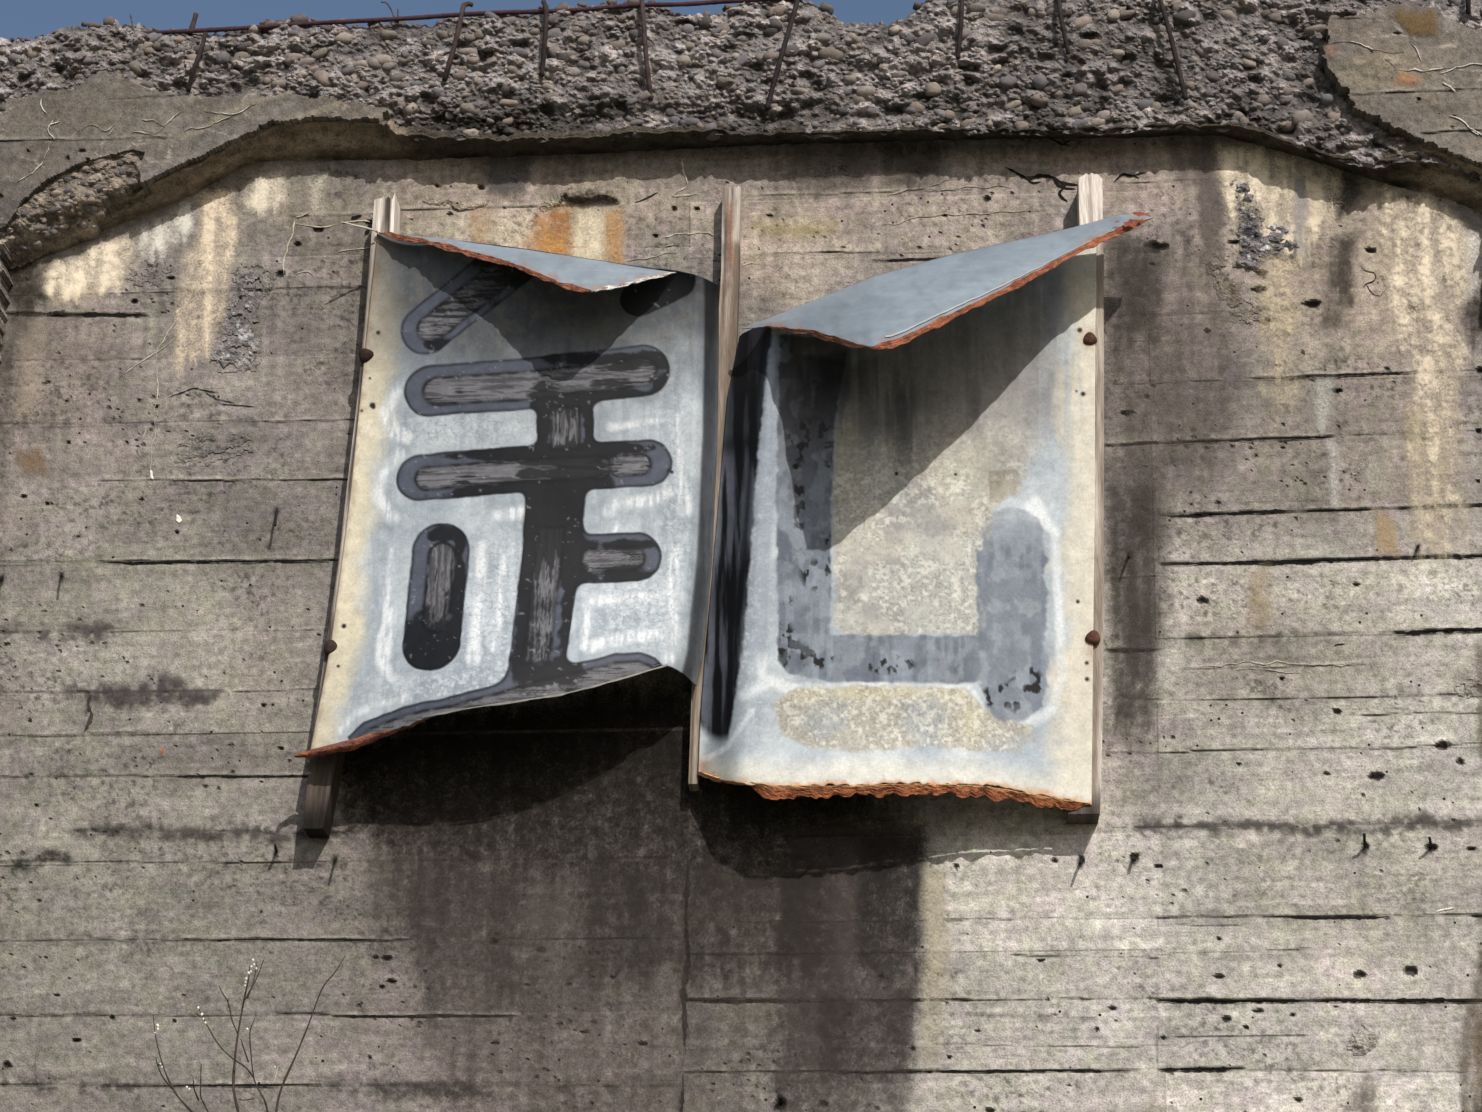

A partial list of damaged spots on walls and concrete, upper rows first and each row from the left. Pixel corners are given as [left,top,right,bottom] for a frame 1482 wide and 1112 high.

spalling [0,0,1482,182]
spalling [0,151,144,363]
water stain [1,172,285,372]
peeling [124,251,172,287]
peeling [205,262,279,373]
corrosion [535,214,571,255]
peeling [1204,177,1305,333]
peeling [1387,298,1460,325]
peeling [176,430,253,466]
peeling [1454,673,1482,698]
water stain [342,671,949,1112]